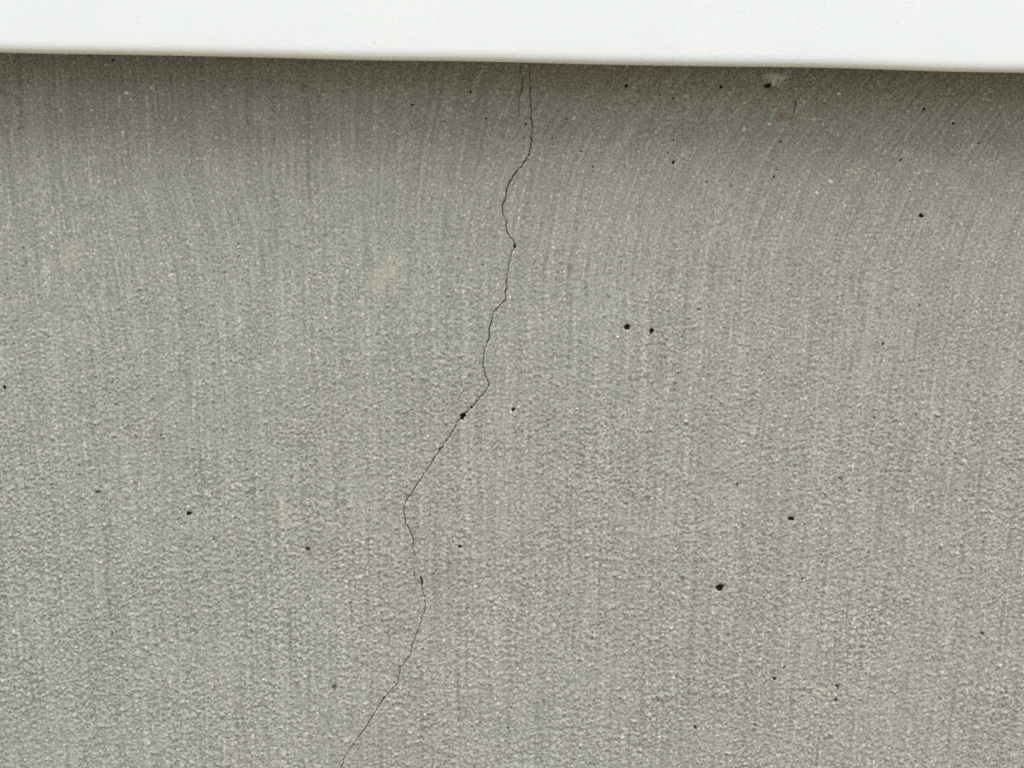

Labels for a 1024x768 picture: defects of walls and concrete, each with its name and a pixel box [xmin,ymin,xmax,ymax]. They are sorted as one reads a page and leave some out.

crack [340,65,533,768]